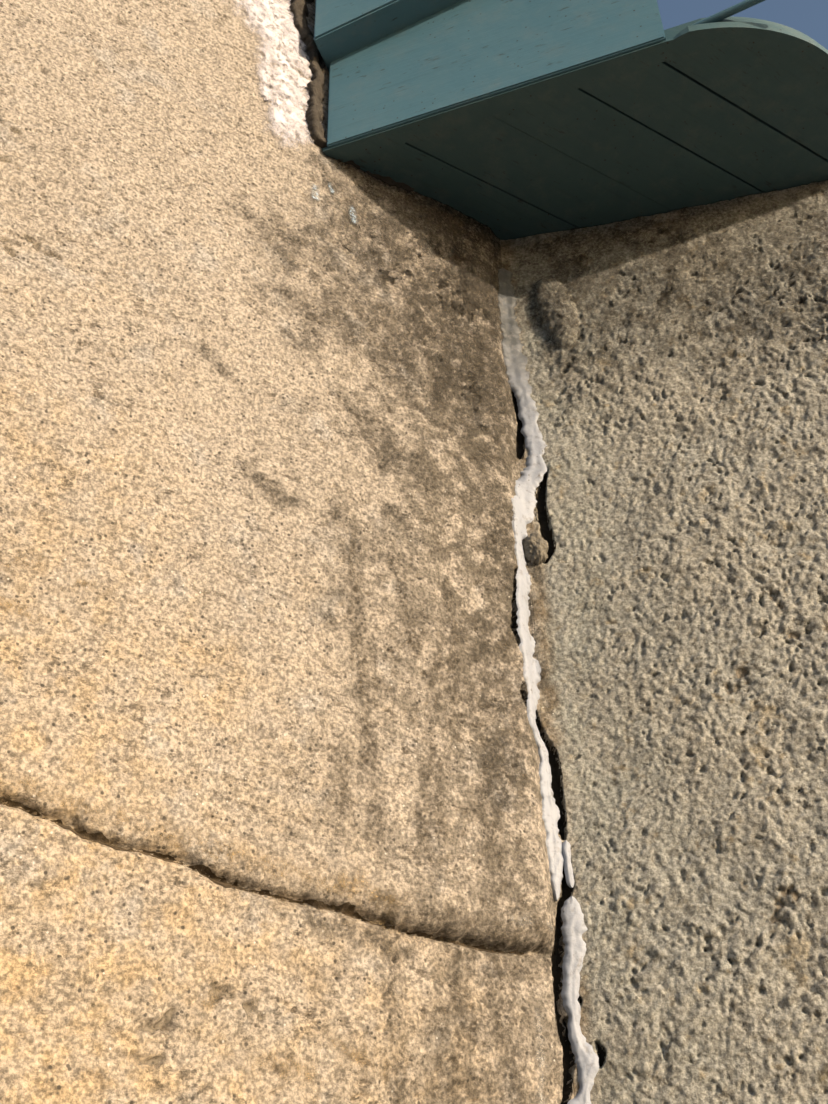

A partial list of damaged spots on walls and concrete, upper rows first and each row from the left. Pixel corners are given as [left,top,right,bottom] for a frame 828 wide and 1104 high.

crack [0,238,59,260]
leakage [243,150,515,591]
leakage [335,508,373,704]
leakage [432,579,462,728]
leakage [472,617,526,869]
crack [496,268,606,1104]
crack [0,800,524,956]